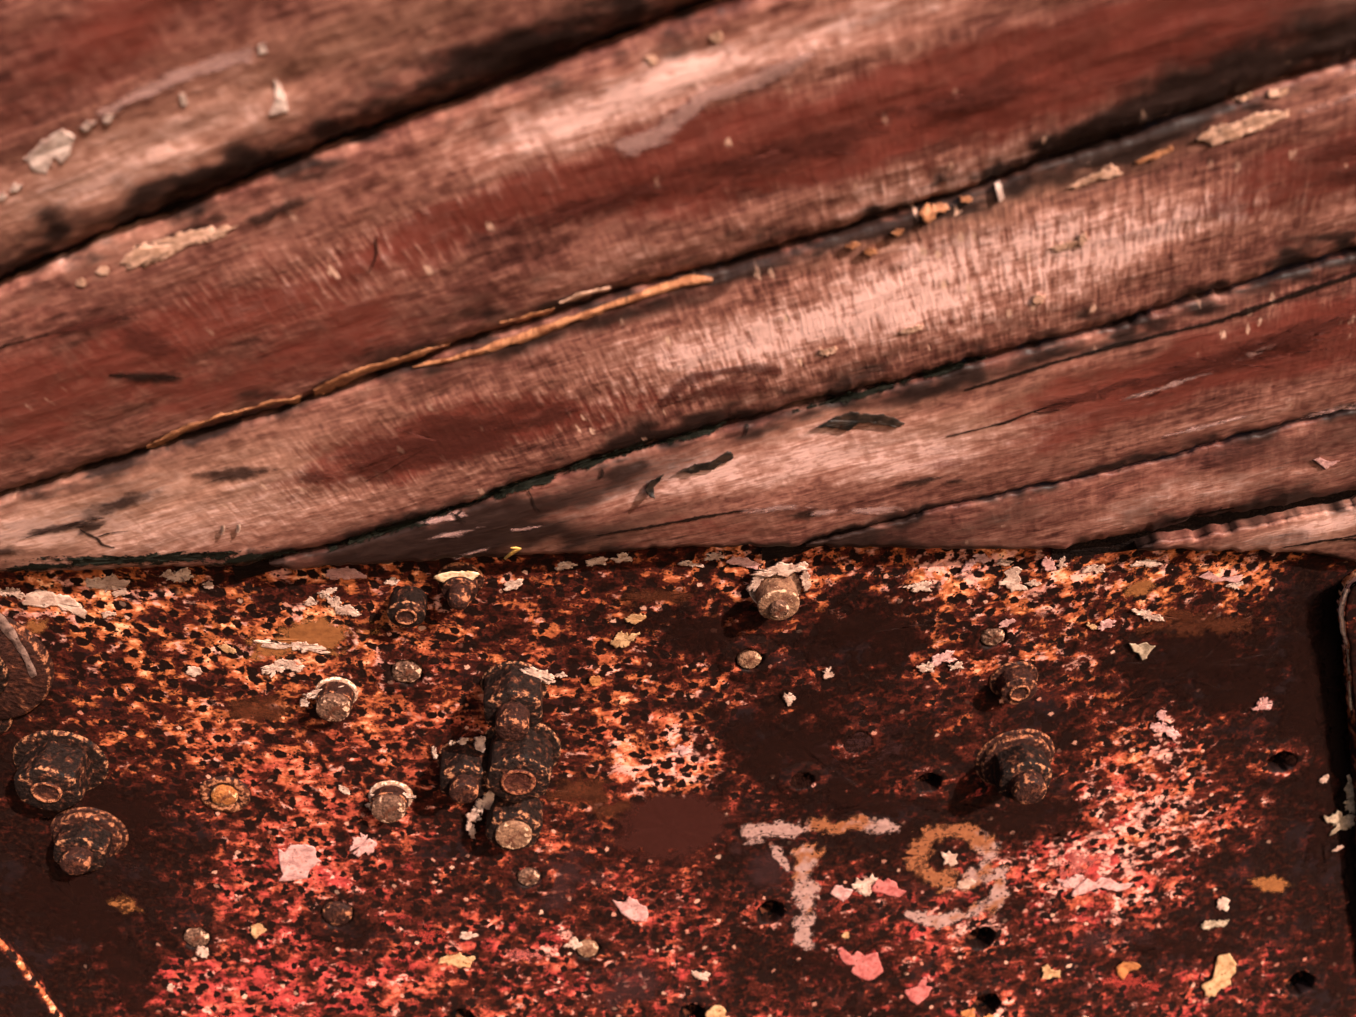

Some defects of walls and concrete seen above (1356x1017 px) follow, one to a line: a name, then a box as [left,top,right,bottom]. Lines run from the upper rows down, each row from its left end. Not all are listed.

crack [964,272,1356,391]
crack [946,401,1067,437]
peeling [961,553,1105,593]
peeling [0,573,130,619]
peeling [253,639,331,678]
corrosion [247,617,381,661]
peeling [916,650,964,673]
corrosion [1274,583,1356,1017]
corrosion [1248,875,1288,892]
corrosion [1107,919,1241,968]
corrosion [787,930,927,1017]
peeling [1201,953,1237,997]